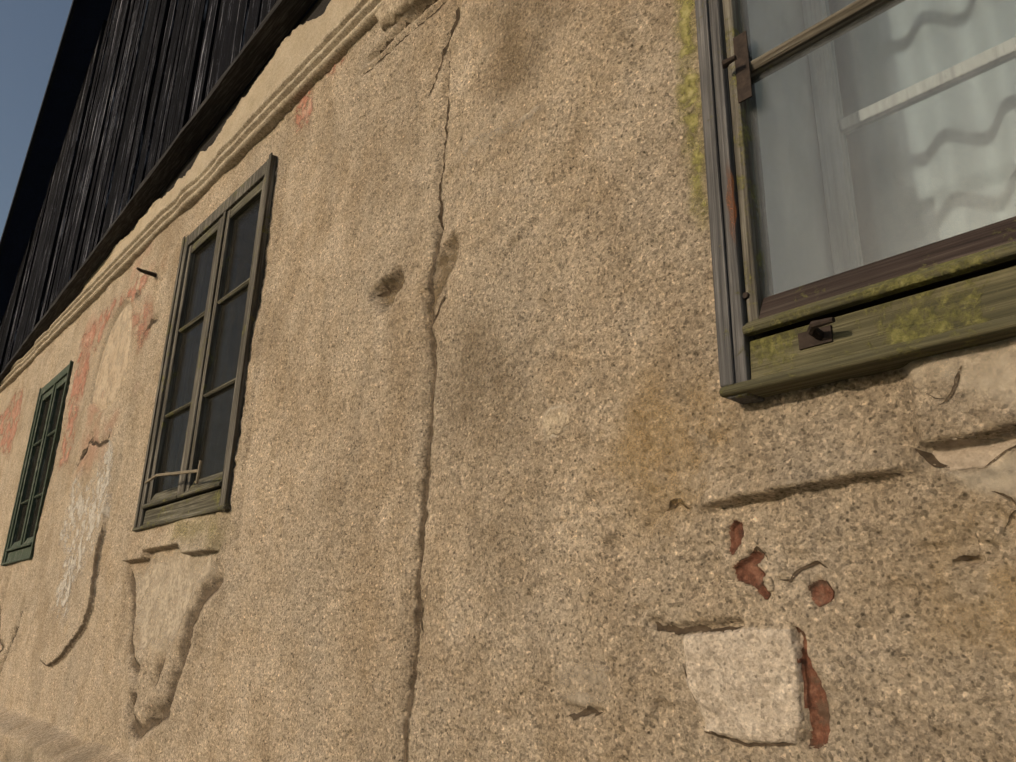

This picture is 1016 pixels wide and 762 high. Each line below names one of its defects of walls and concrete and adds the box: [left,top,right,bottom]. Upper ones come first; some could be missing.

spalling [365,0,447,74]
spalling [377,276,405,312]
crack [403,0,463,762]
crack [926,366,962,405]
crack [992,491,1016,528]
flaking render [729,520,775,600]
flaking render [808,580,835,607]